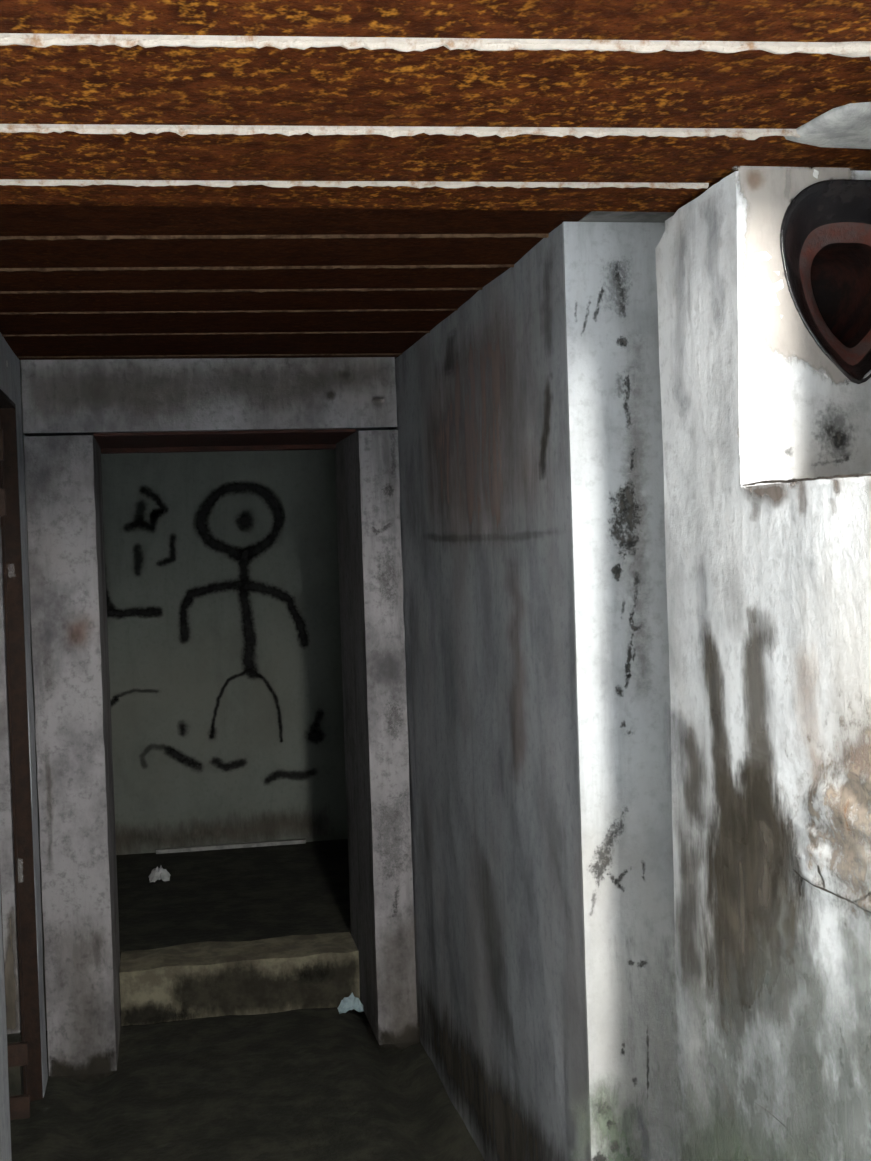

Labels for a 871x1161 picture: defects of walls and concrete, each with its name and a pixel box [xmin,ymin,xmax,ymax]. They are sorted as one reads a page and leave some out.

damp [609,449,639,581]
damp [616,577,640,697]
damp [593,812,627,891]
damp [672,612,871,1161]
damp [632,1029,649,1099]